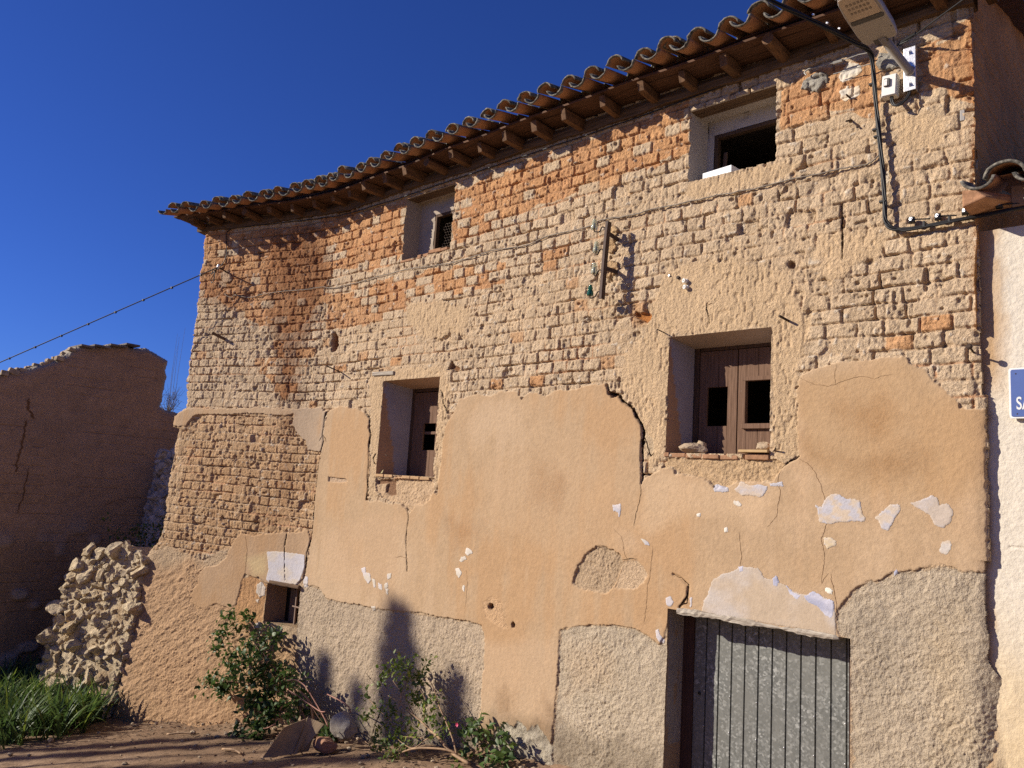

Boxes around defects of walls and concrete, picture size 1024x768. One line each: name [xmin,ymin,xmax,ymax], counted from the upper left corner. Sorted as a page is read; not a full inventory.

crack [15,399,35,511]
crack [608,386,654,620]
spalling [663,455,785,506]
peeling [815,494,953,531]
crack [677,576,689,607]
spalling [235,545,667,768]
spalling [690,540,1002,768]